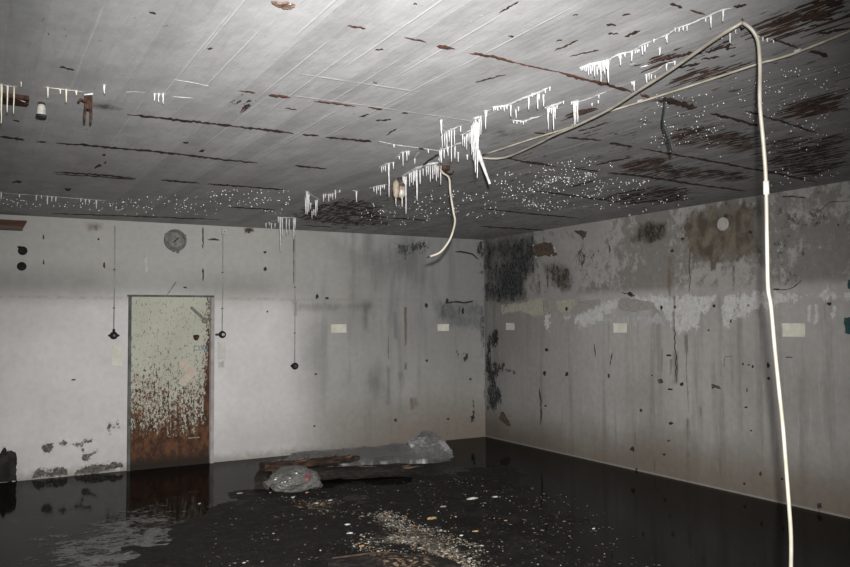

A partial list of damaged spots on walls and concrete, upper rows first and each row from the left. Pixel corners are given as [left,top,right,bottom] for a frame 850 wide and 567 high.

water stain [371,8,732,206]
water stain [0,192,106,209]
water stain [476,233,572,306]
spalling [532,242,557,258]
water stain [684,201,759,270]
peeling [563,284,850,335]
water stain [481,316,516,411]
spalling [32,438,125,478]